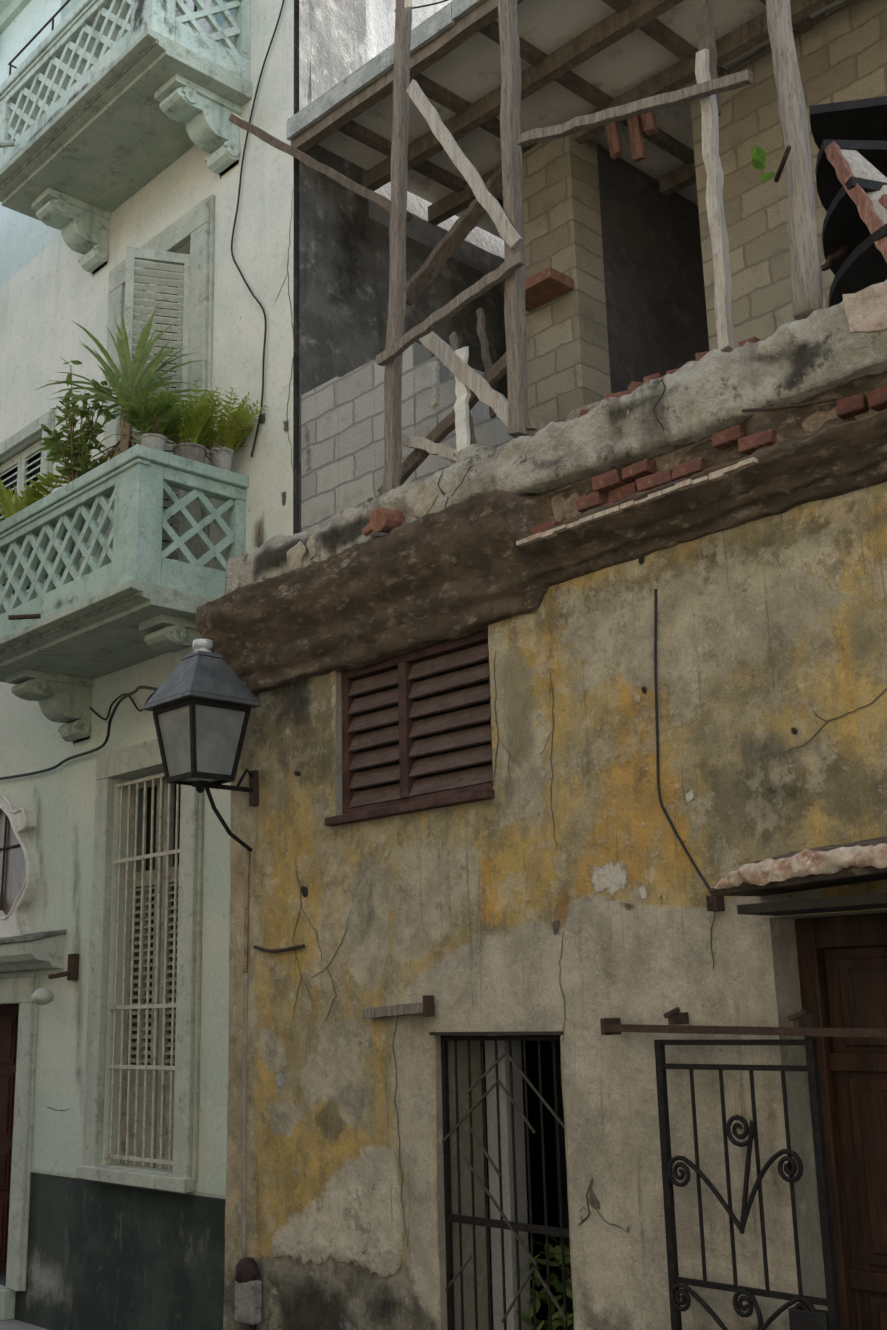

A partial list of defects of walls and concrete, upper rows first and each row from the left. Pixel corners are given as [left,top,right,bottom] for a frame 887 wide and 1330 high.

spalling [604,368,680,401]
flaking render [516,385,887,547]
peeling [404,479,439,517]